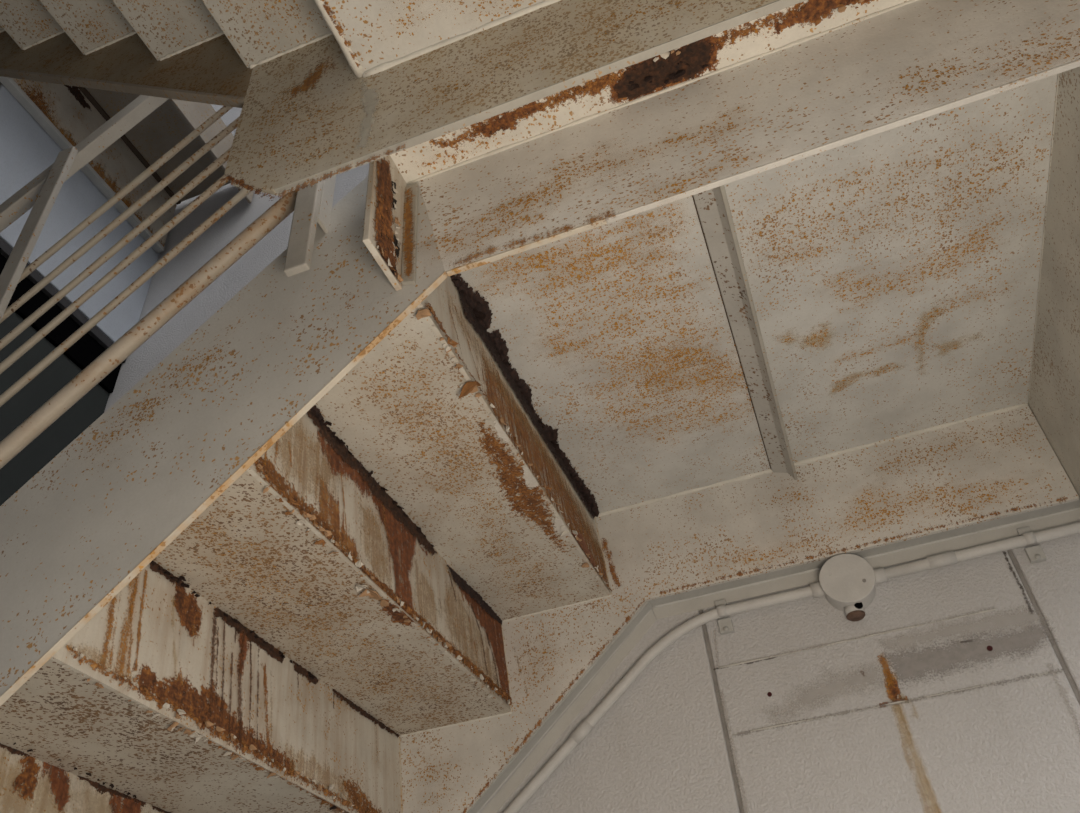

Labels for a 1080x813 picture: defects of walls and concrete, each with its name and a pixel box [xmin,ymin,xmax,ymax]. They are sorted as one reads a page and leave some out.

corrosion [380,0,873,167]
corrosion [888,21,1080,109]
corrosion [741,129,1047,313]
corrosion [403,103,771,587]
corrosion [99,405,459,776]
corrosion [358,326,554,601]
corrosion [447,565,642,813]
corrosion [660,421,1067,594]
corrosion [878,656,908,708]
corrosion [340,775,400,813]